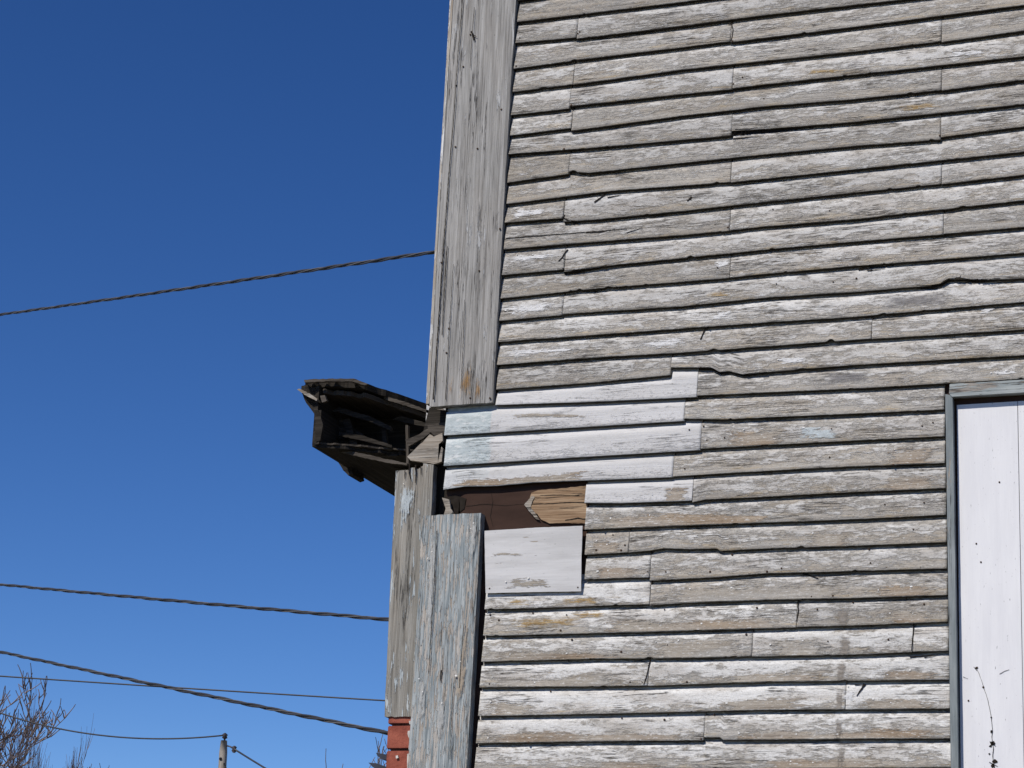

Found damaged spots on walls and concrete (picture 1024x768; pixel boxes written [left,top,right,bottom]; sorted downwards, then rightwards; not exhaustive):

peeling [452,471,589,486]